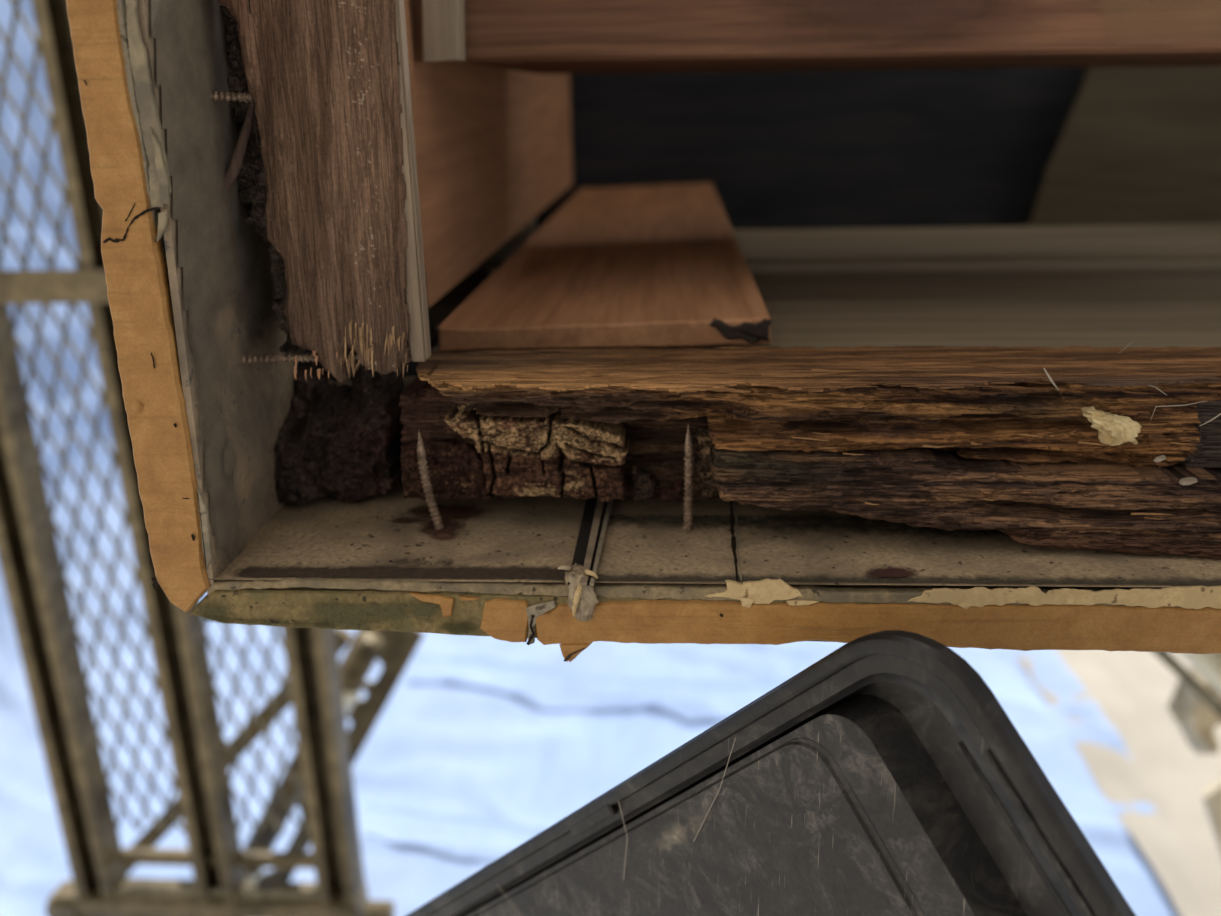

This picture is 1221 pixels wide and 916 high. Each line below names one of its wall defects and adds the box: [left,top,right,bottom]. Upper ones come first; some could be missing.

crack [103,203,162,243]
crack [730,501,742,581]
peeling [409,591,480,618]
spalling [526,600,556,645]
peeling [705,579,819,608]
peeling [908,585,1221,609]